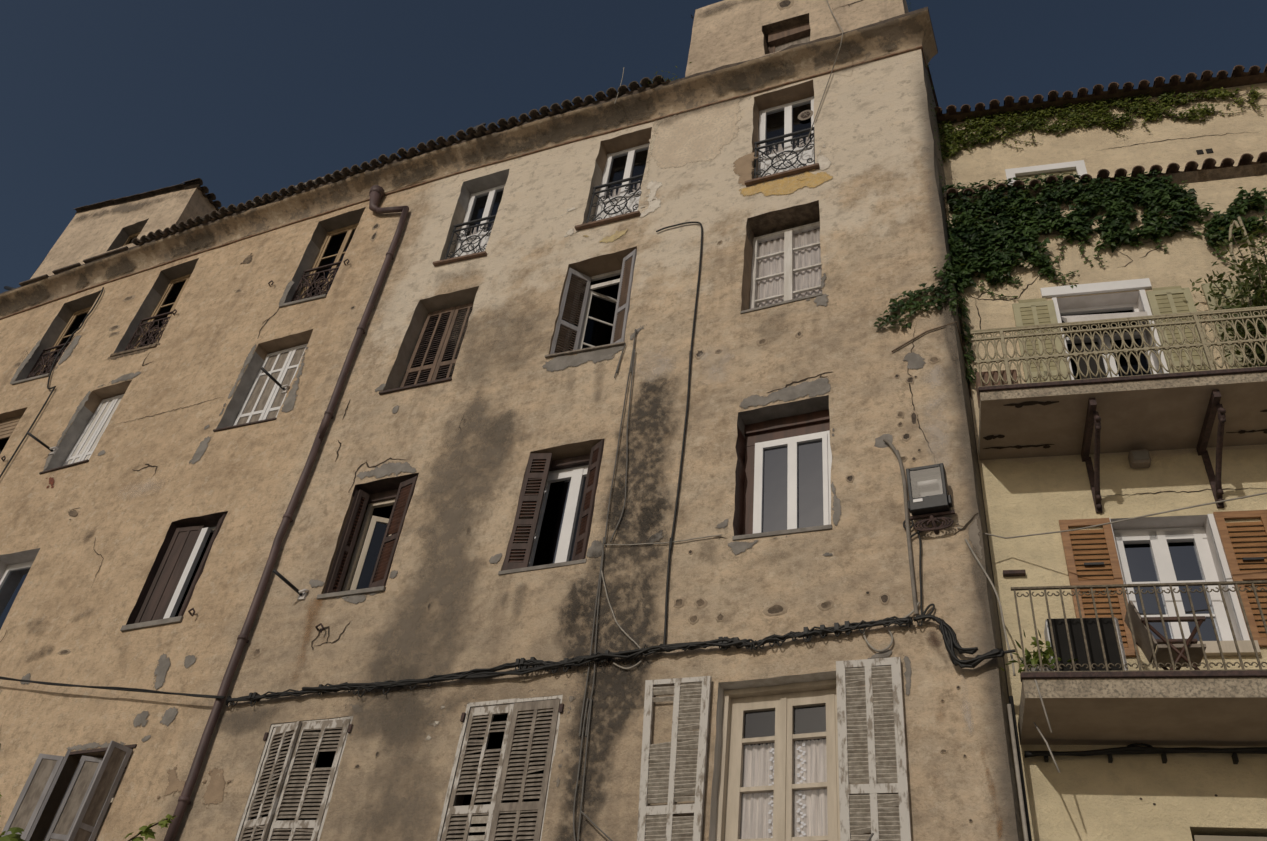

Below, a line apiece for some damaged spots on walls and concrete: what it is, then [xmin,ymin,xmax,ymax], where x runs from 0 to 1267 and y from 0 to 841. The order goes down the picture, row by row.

water stain [716,61,795,94]
peeling [640,98,742,217]
peeling [733,144,835,196]
crack [907,323,936,463]
water stain [356,399,513,841]
water stain [557,378,671,841]